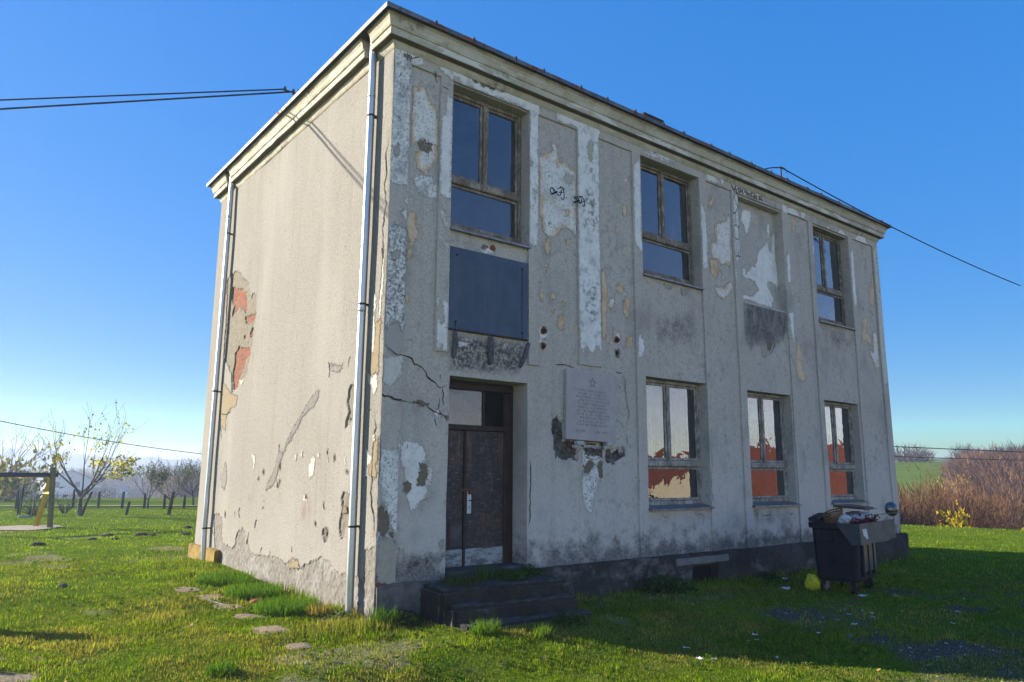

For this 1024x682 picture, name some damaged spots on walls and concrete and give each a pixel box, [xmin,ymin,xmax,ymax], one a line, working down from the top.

peeling [367,48,645,395]
peeling [700,174,791,308]
spalling [224,272,256,392]
leakage [454,340,521,370]
spalling [214,511,387,618]
spalling [314,493,350,542]
peeling [364,431,434,541]
crack [368,345,448,531]
peeling [551,416,625,513]